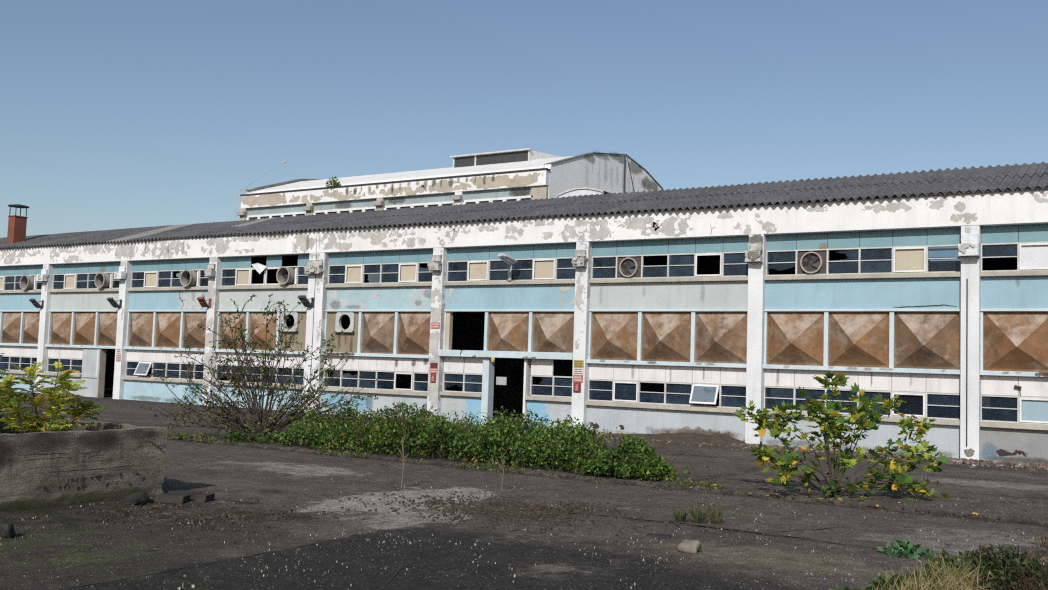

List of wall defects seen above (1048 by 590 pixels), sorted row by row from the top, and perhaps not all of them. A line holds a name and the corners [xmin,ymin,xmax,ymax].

peeling [241,172,543,207]
peeling [717,212,777,260]
peeling [861,202,912,214]
peeling [927,195,978,253]
peeling [409,271,460,415]
damp [0,416,116,461]